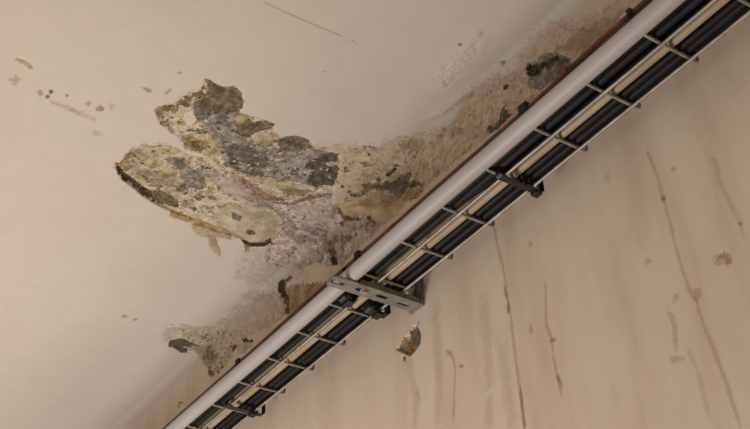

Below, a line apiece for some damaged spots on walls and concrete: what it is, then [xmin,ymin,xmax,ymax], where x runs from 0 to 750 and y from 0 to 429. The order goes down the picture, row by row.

water stain [458,0,636,142]
flaking render [525,51,571,90]
flaking render [113,79,385,268]
water stain [337,147,434,208]
flaking render [169,293,287,376]
flaking render [398,326,421,361]